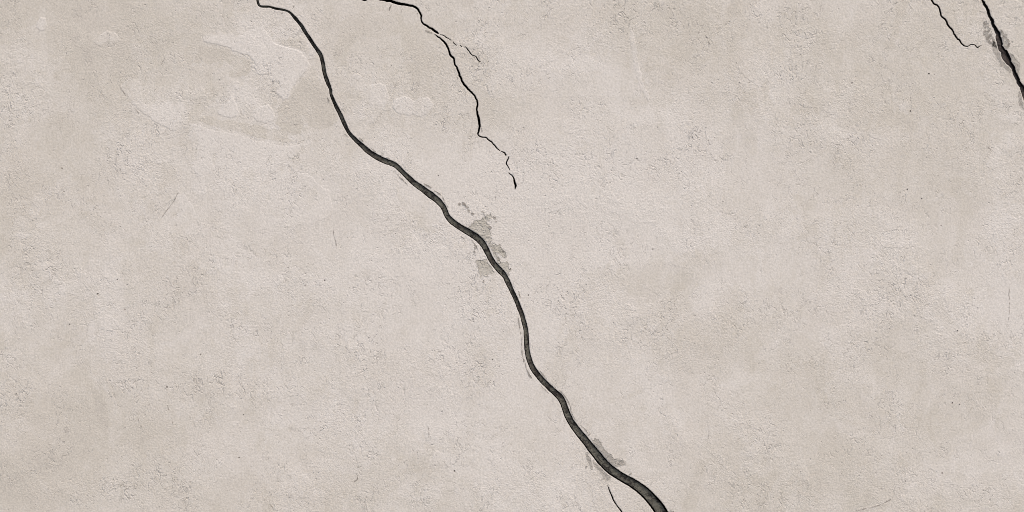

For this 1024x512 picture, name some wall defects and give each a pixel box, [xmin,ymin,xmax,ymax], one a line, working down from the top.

crack [256,0,669,512]
crack [930,0,1024,101]